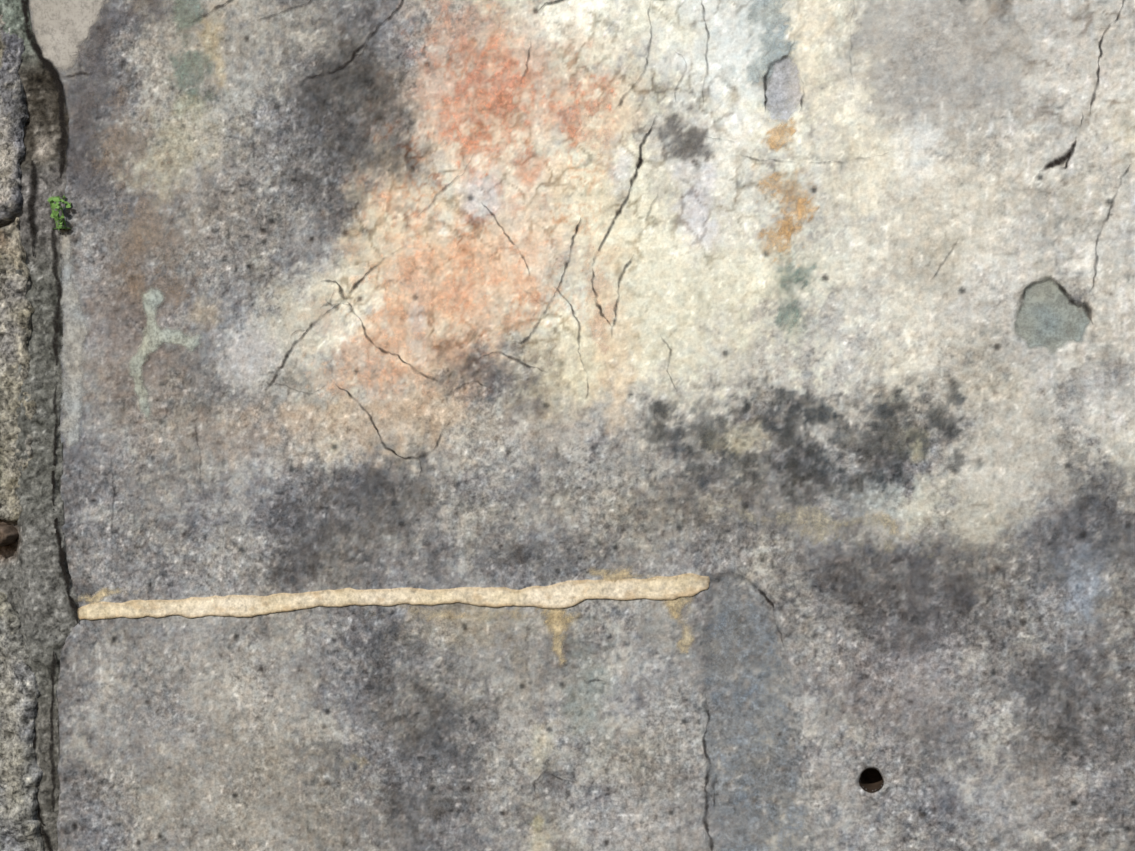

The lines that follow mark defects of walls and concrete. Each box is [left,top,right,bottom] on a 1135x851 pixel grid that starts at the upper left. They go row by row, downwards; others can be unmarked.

crack [307,0,403,78]
crack [764,55,788,105]
spalling [767,59,801,119]
crack [1044,0,1124,168]
crack [484,122,654,367]
crack [270,266,375,384]
spalling [1015,277,1091,352]
crack [340,388,422,471]
water stain [646,402,759,482]
water stain [764,392,852,496]
water stain [848,391,960,492]
crack [702,713,713,849]